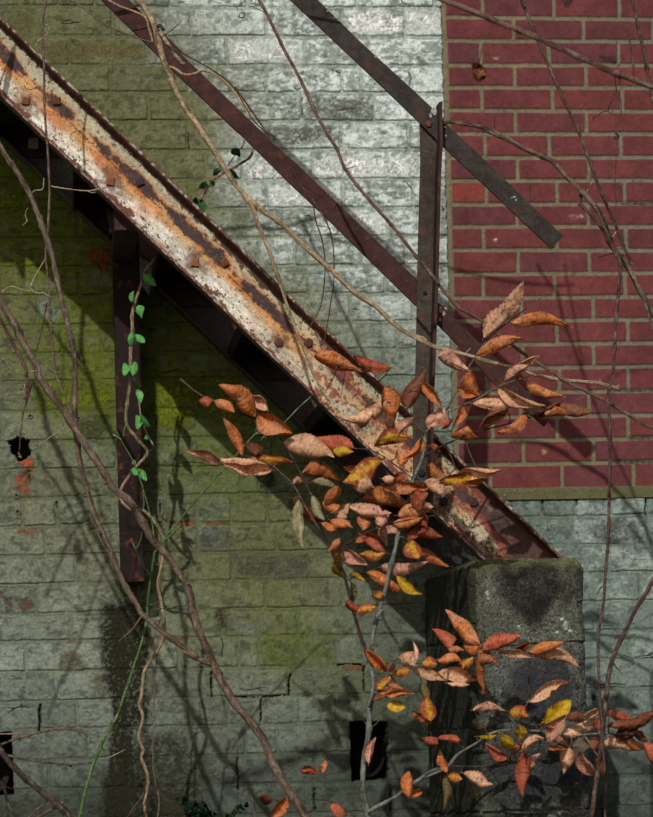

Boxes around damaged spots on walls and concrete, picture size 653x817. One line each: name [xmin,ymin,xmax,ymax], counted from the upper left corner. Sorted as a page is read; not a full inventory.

spalling [12,440,32,467]
damp [502,567,578,622]
damp [96,584,150,817]
damp [149,738,201,817]